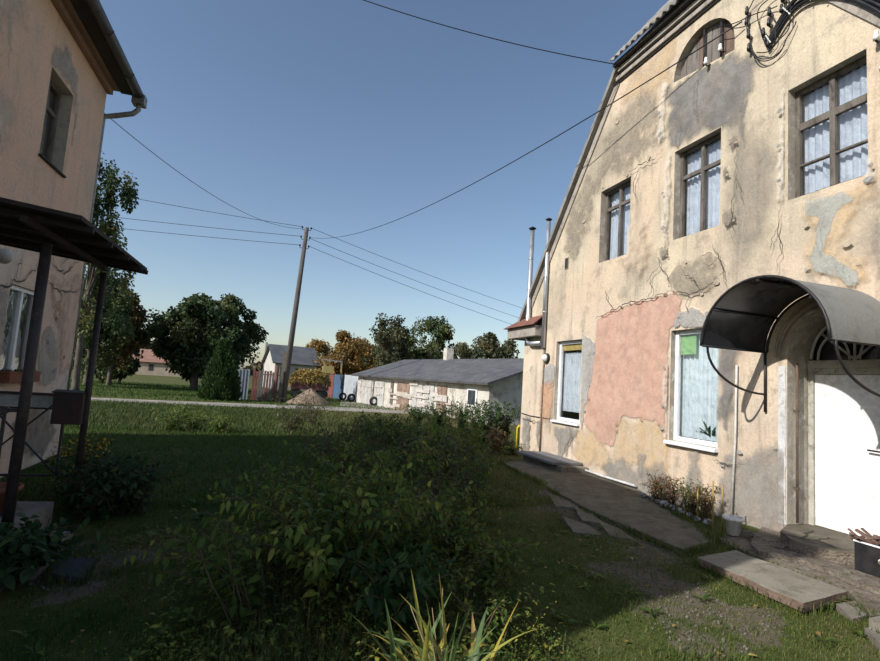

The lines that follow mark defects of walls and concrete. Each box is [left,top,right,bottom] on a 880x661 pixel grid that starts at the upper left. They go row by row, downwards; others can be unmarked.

crack [0,250,81,303]
peeling [41,276,82,383]
peeling [574,250,728,473]
peeling [658,153,670,260]
crack [595,149,744,319]
spalling [804,161,874,284]